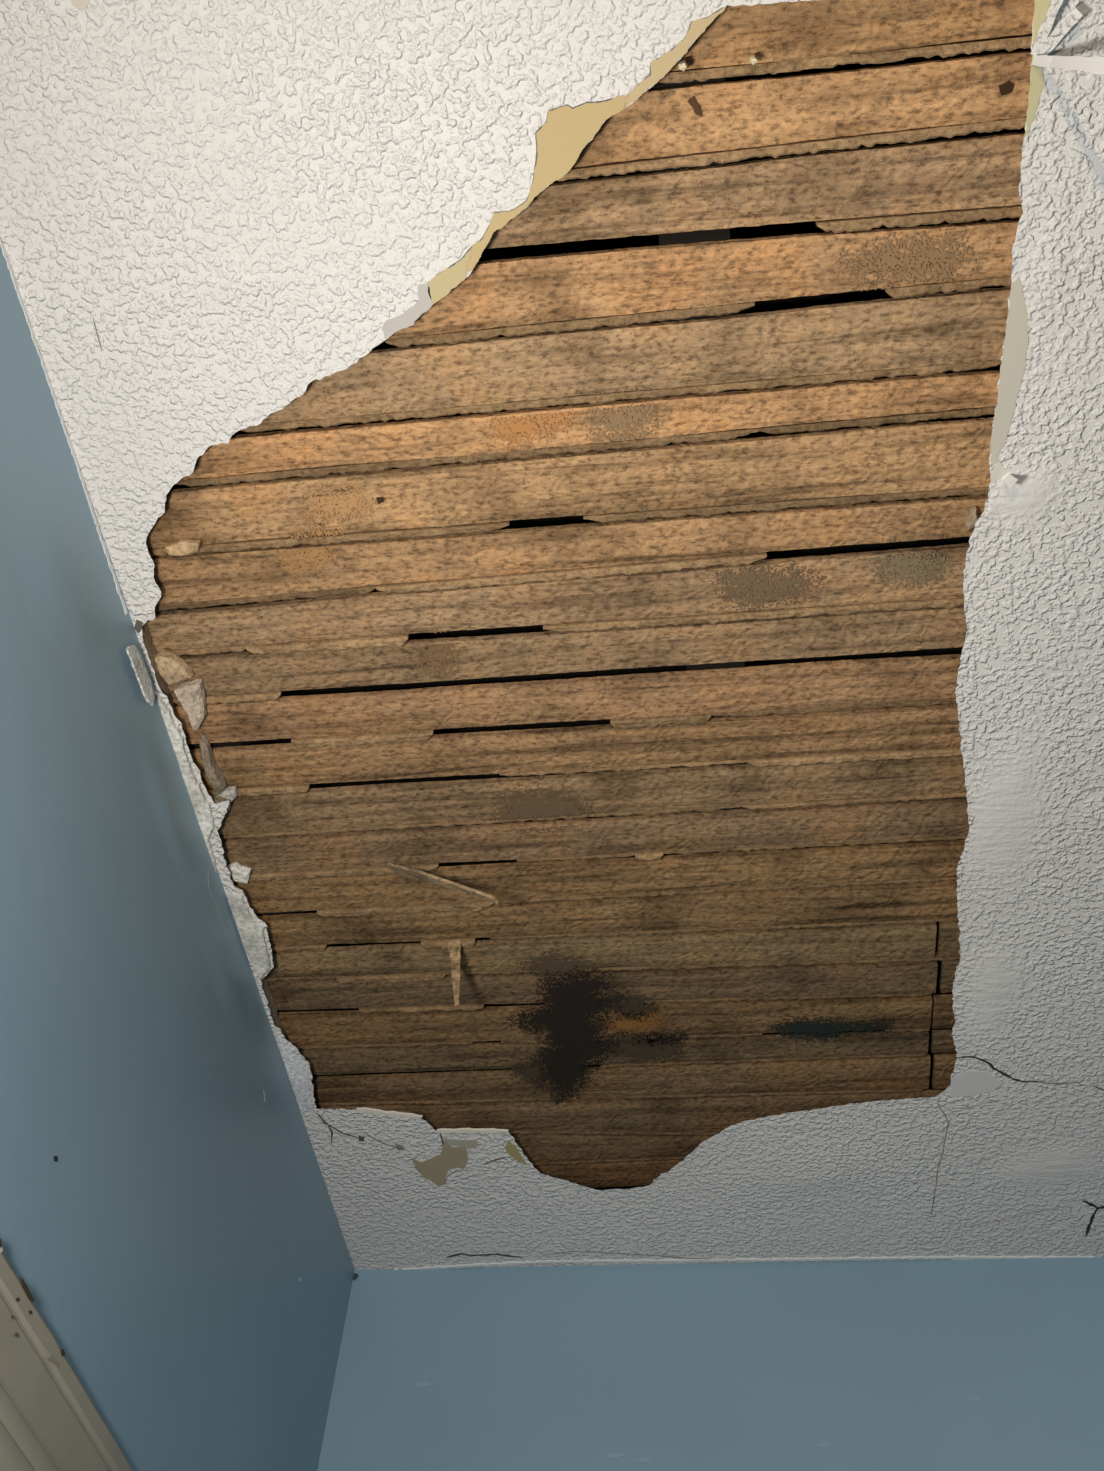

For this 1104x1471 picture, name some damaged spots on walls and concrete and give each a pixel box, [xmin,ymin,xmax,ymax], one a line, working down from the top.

peeling [382,6,726,339]
spalling [990,278,1028,489]
spalling [154,691,218,873]
spalling [227,891,271,980]
spalling [276,1033,314,1113]
spalling [356,1107,422,1118]
peeling [394,1128,527,1187]
water stain [506,950,694,1105]
water stain [766,1012,894,1046]
crack [930,1056,1104,1237]